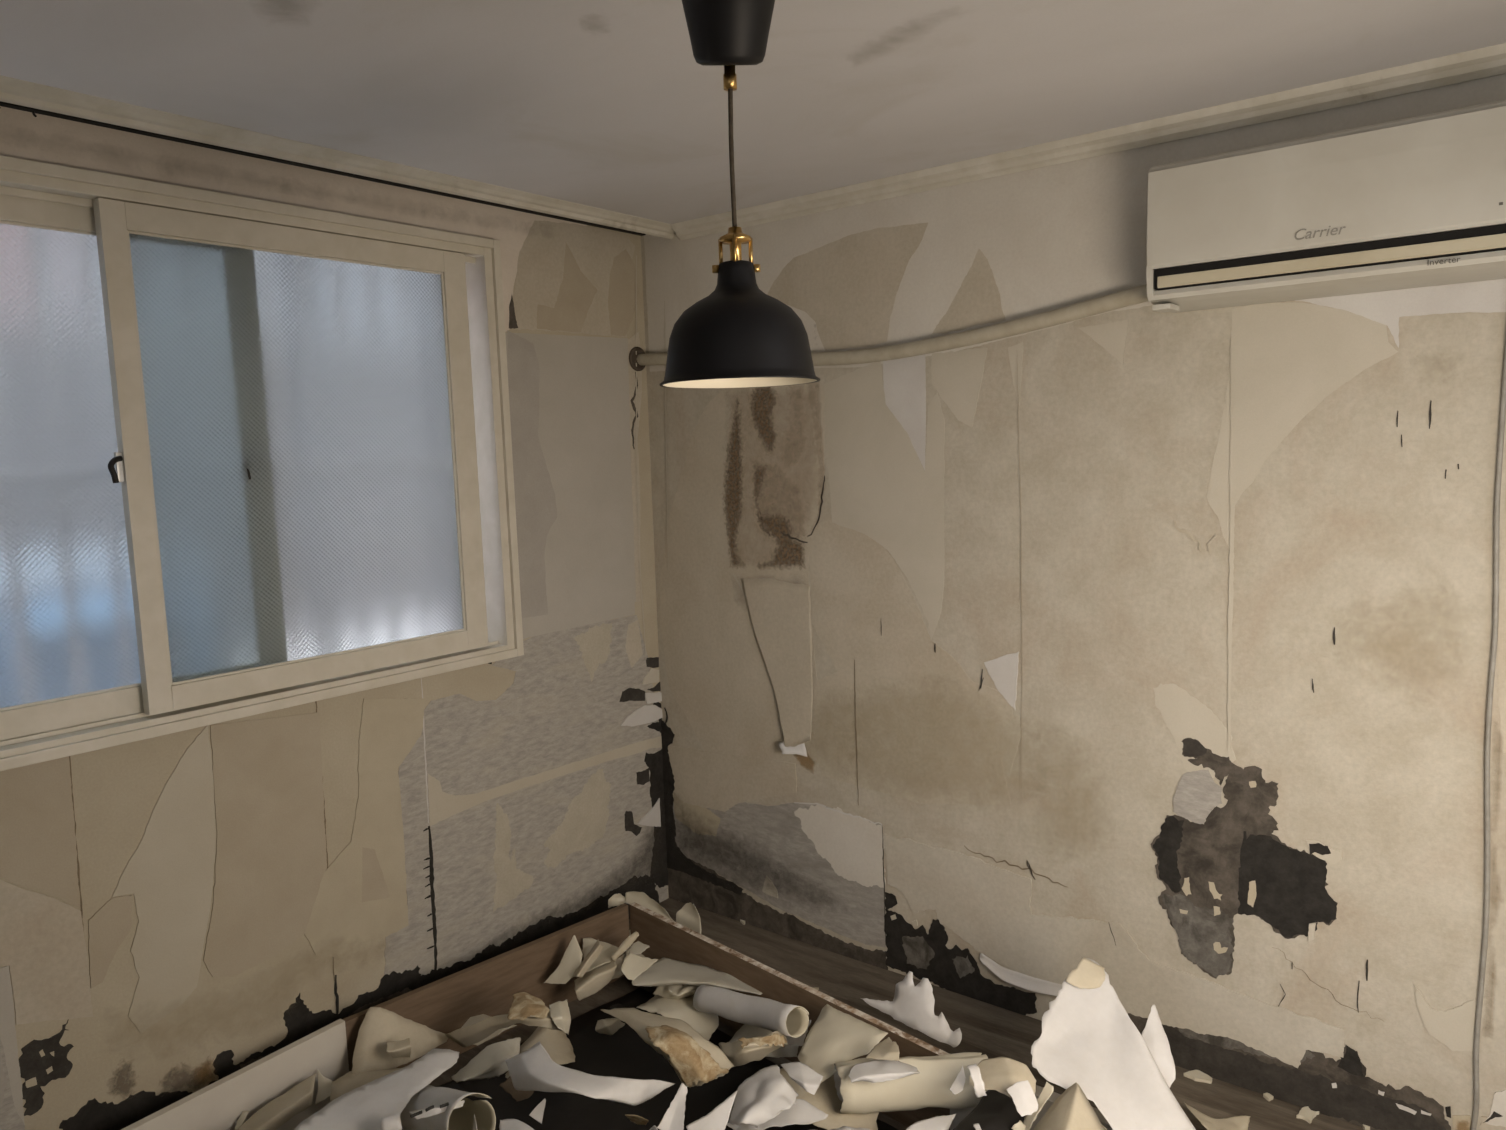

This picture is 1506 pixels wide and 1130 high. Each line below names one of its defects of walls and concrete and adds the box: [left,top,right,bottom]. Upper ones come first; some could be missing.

leakage [724,387,776,565]
leakage [759,476,825,566]
peeling [59,657,1062,1130]
spalling [1151,738,1342,979]
peeling [19,1019,74,1116]
peeling [1128,1013,1451,1130]